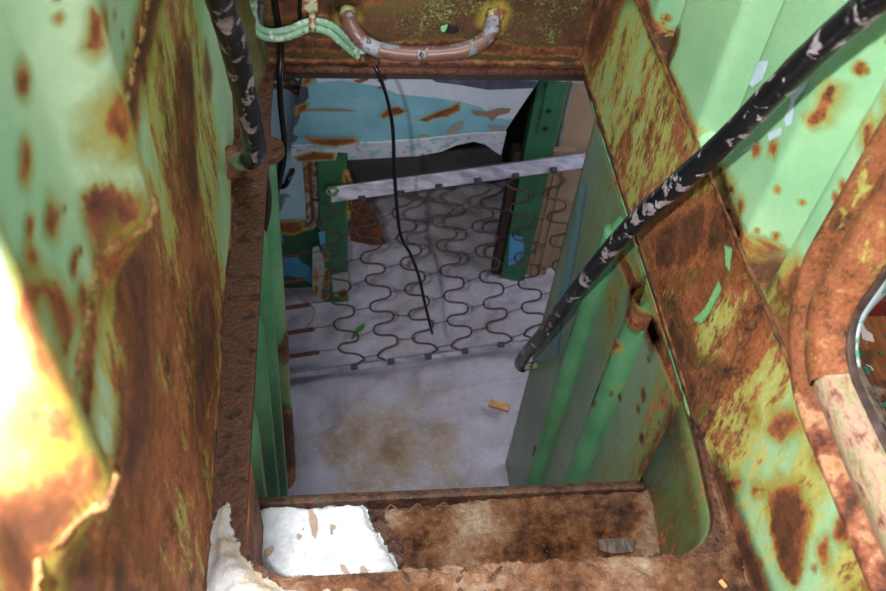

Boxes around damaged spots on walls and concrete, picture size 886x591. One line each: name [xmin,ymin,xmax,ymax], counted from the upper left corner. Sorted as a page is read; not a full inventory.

rust [82,0,164,155]
rust [177,36,200,215]
rust [266,35,347,55]
peeling [291,78,537,143]
rust [472,0,700,137]
peeling [748,60,769,87]
peeling [768,81,807,141]
rust [803,82,840,127]
rust [639,165,802,312]
rust [0,180,157,591]
rust [615,249,724,475]
rust [711,459,848,591]